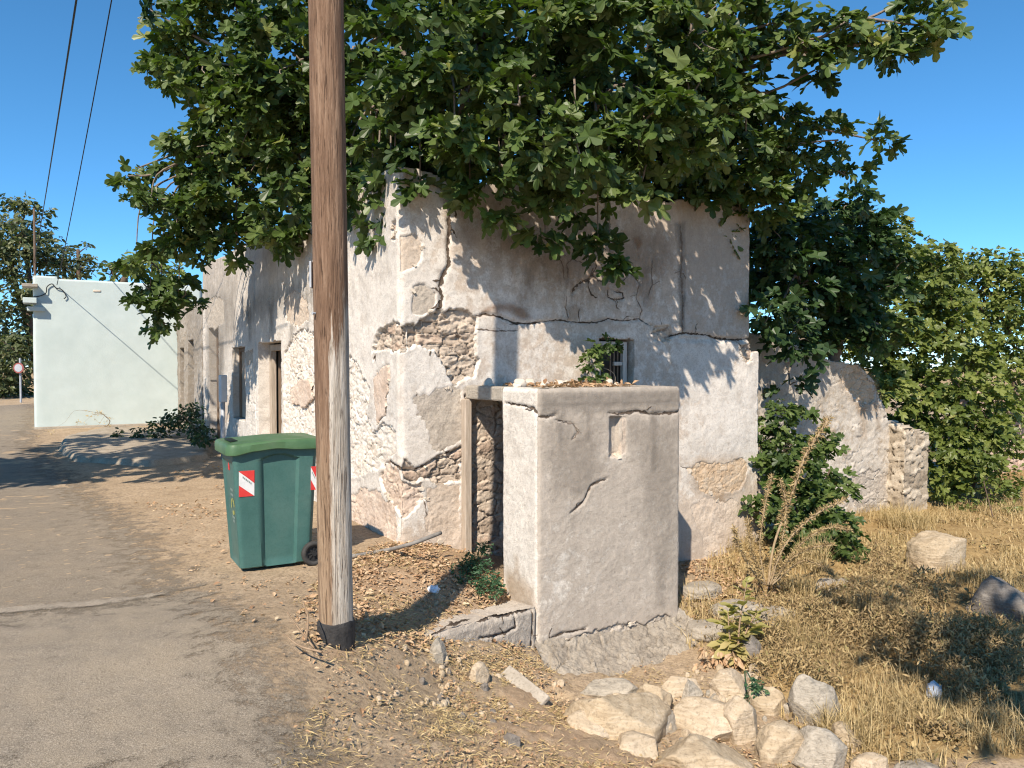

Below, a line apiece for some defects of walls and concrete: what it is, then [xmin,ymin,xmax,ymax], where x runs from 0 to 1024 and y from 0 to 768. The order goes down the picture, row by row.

crack [476,226,748,346]
flaking render [284,292,316,436]
flaking render [349,284,504,556]
crack [570,479,606,513]